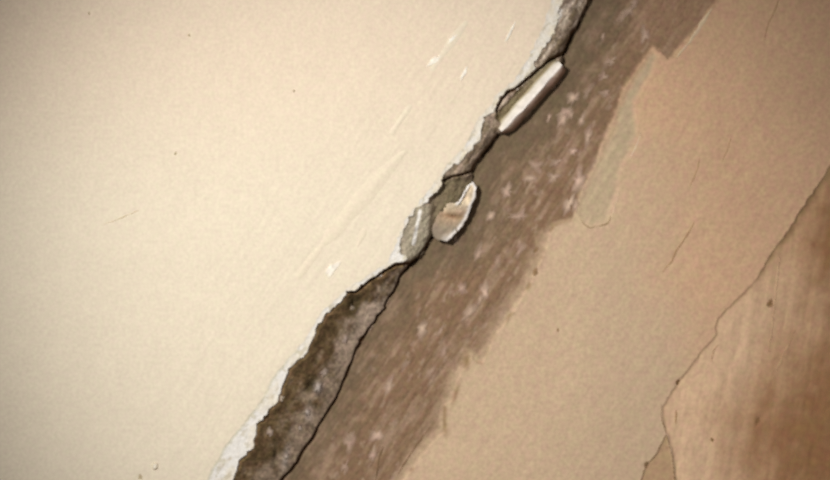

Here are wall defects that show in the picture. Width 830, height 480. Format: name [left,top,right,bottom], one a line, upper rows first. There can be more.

crack [281,236,434,480]
peeling [207,0,718,480]
crack [442,133,499,181]
crack [496,0,590,112]
peeling [642,166,830,480]